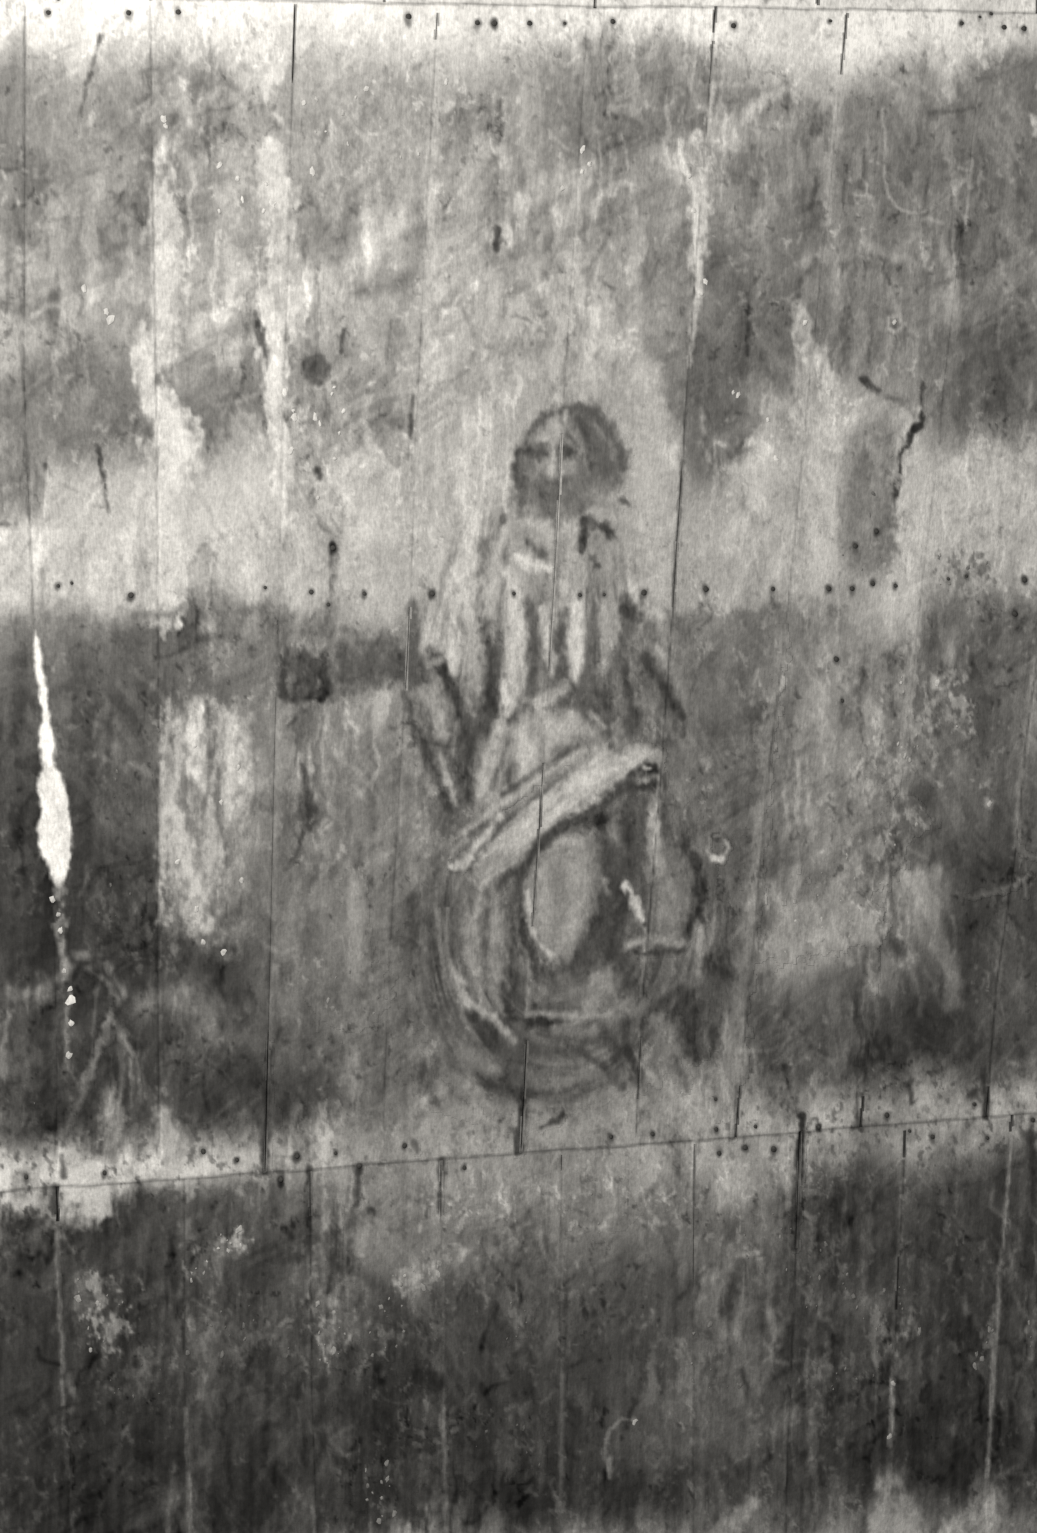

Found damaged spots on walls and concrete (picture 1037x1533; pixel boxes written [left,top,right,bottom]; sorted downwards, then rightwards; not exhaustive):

leakage [0,0,1037,259]
crack [0,458,30,532]
leakage [0,115,1037,712]
crack [815,347,928,500]
peeling [31,628,266,1083]
peeling [0,1051,46,1144]
leakage [0,624,1037,1533]